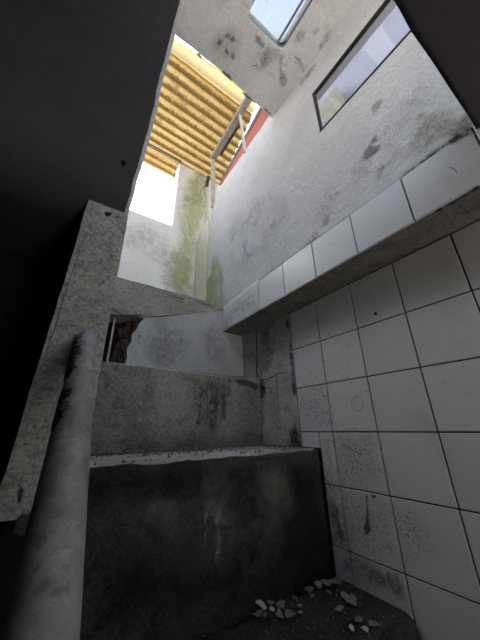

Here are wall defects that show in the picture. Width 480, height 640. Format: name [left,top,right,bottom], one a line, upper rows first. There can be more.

spalling [102,318,141,365]